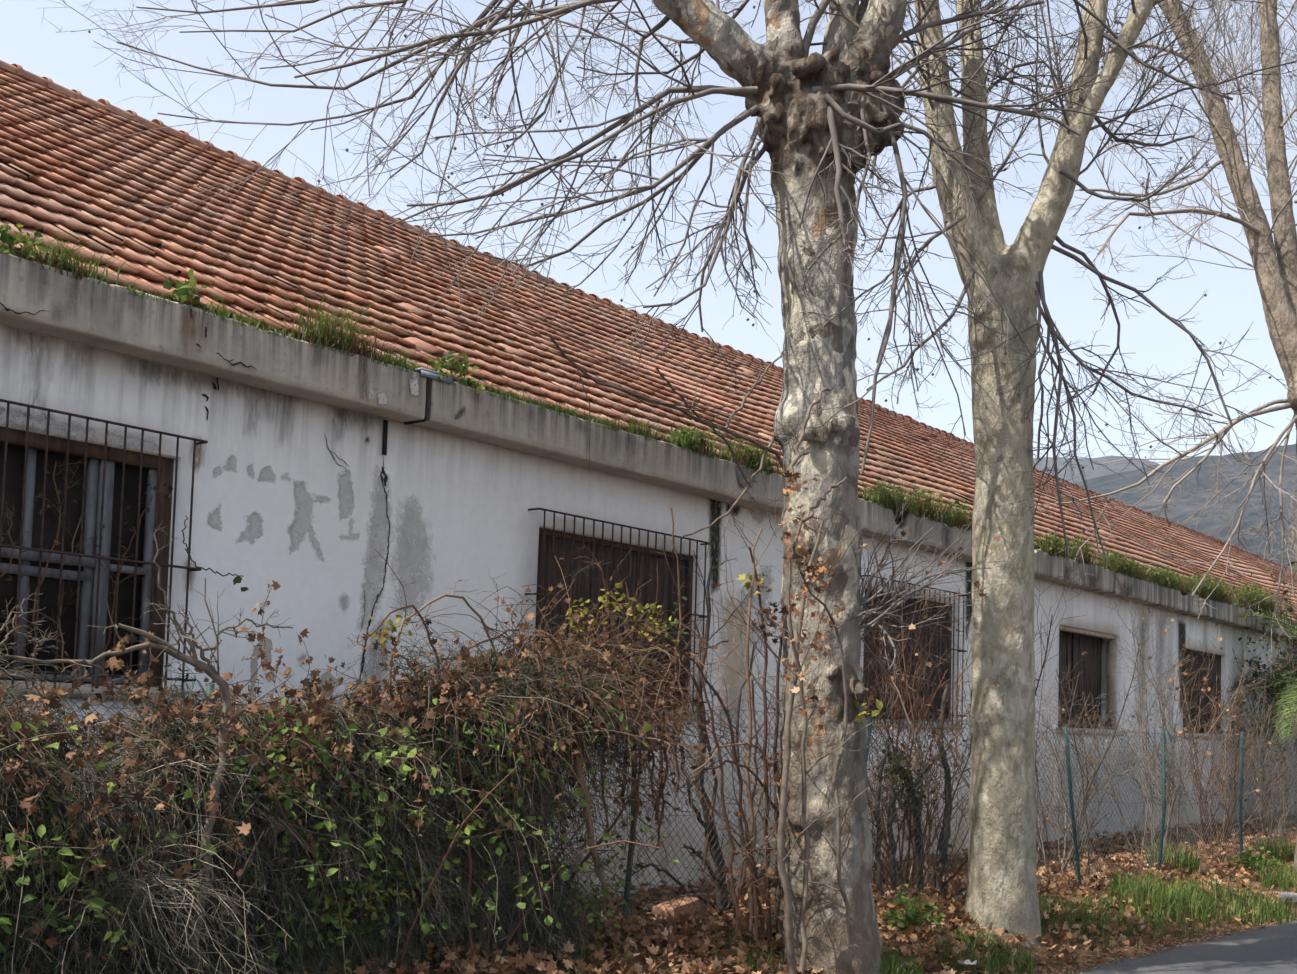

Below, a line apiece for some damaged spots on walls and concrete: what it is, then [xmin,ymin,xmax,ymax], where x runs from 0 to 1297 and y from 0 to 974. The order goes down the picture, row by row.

peeling [207,509,221,530]
peeling [213,437,390,683]
crack [359,457,390,679]
water stain [397,501,429,609]